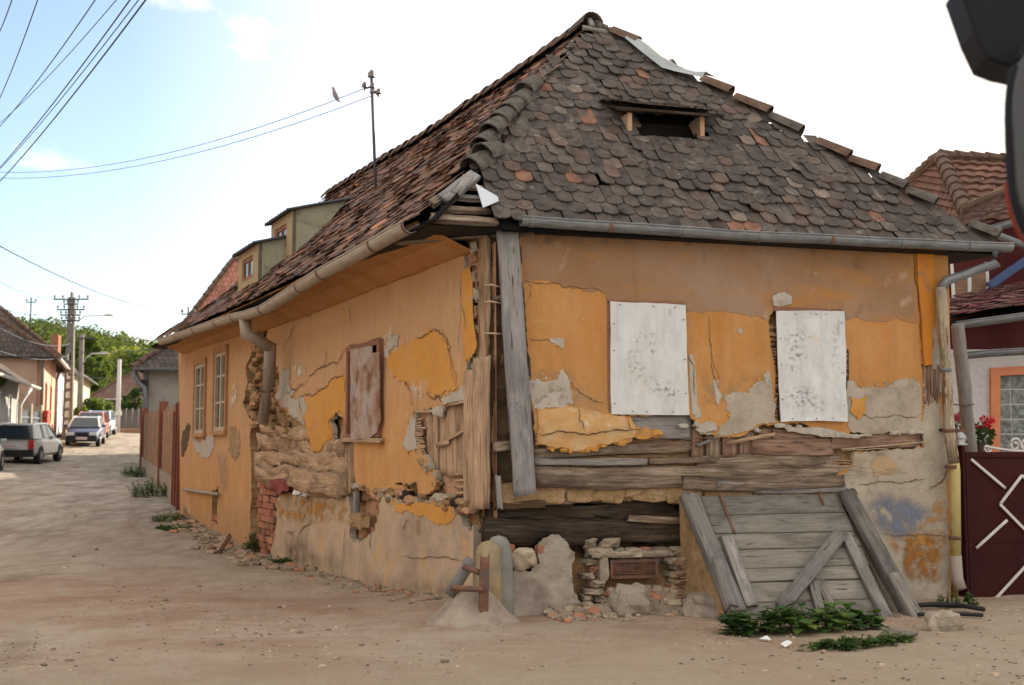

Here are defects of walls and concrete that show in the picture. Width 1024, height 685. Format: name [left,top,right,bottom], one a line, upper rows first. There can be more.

peeling [228,345,346,461]
crack [288,348,345,397]
spalling [279,328,485,539]
crack [689,319,720,392]
peeling [529,324,950,600]